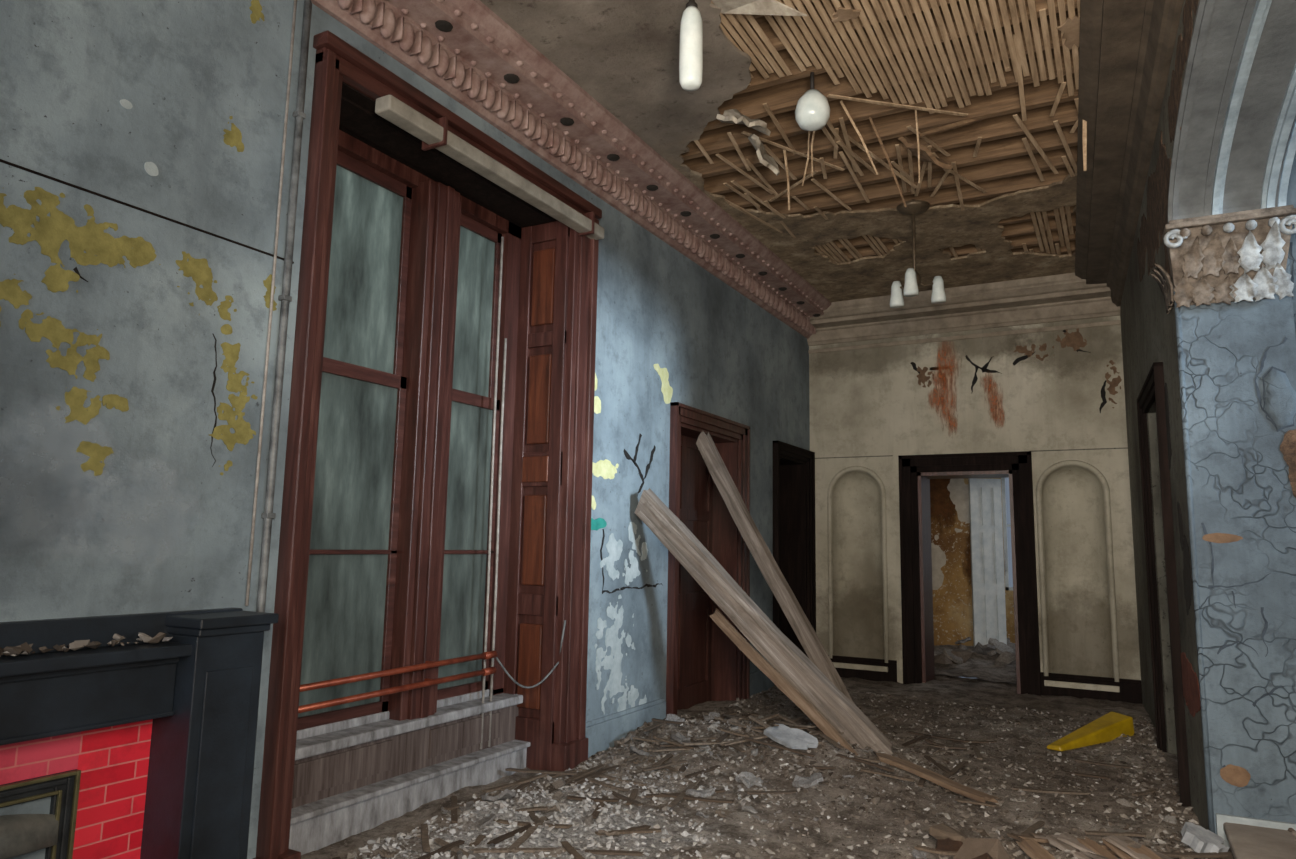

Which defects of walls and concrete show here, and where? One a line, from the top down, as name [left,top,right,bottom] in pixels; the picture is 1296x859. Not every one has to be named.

peeling [223,116,244,152]
spalling [694,0,1080,239]
spalling [1022,206,1076,255]
peeling [0,187,258,476]
crack [1255,242,1296,433]
corrosion [929,347,957,431]
corrosion [984,377,1004,425]
spalling [1280,429,1296,498]
peeling [947,479,970,532]
peeling [931,535,946,590]
crack [1201,523,1270,657]
crack [1252,686,1285,707]